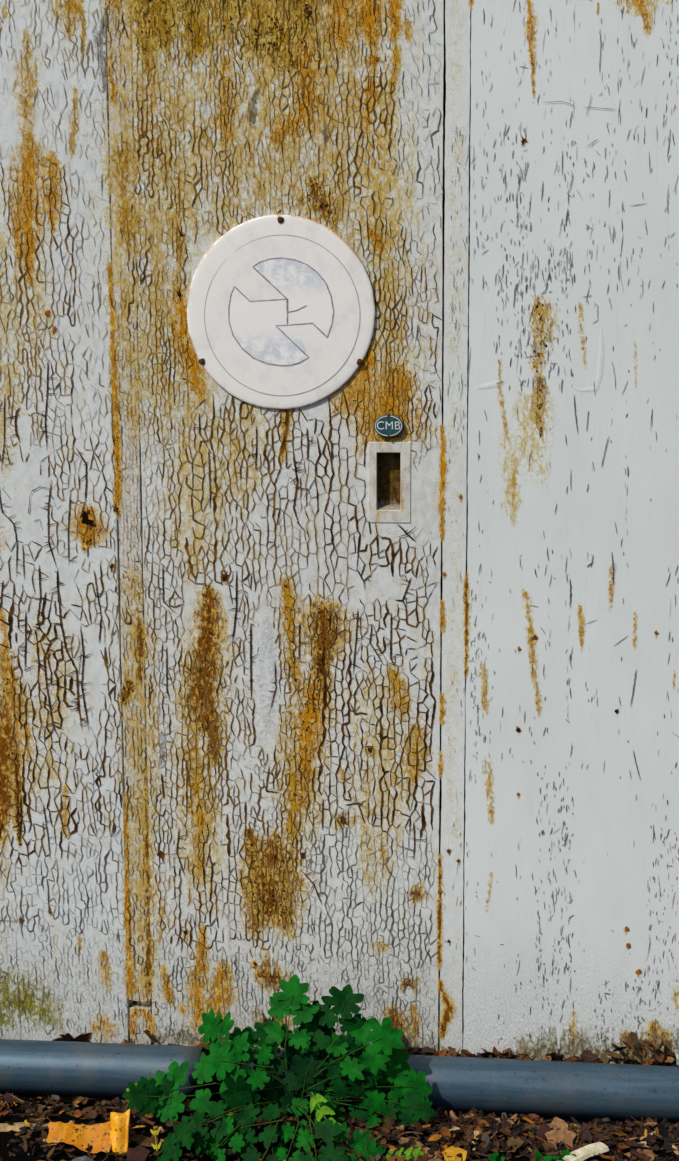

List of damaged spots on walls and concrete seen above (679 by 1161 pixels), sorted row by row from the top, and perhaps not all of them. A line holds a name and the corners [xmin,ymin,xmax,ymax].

crack [509,2,570,88]
crack [599,0,679,160]
rust [0,30,79,470]
crack [450,123,648,439]
rust [66,502,107,552]
rust [99,0,447,1037]
rust [498,296,556,524]
rust [0,607,77,882]
rust [518,589,542,714]
crack [451,510,679,1064]
leakage [0,970,63,1028]
rust [407,854,455,1039]